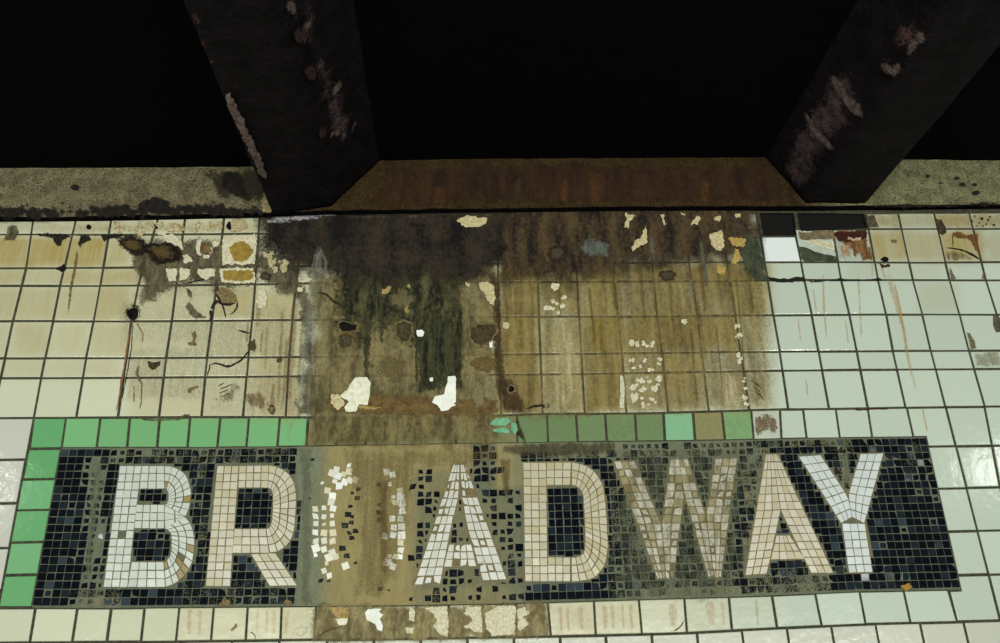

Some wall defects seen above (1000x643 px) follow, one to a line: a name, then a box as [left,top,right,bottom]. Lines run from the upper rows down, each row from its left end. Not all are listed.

water stain [0,171,335,223]
peeling [114,220,289,303]
water stain [581,234,609,258]
rust [834,230,890,268]
rust [116,323,133,409]
crack [185,279,250,375]
peeling [331,394,345,410]
water stain [308,242,764,446]
peeling [629,339,662,409]
peeling [405,608,415,634]